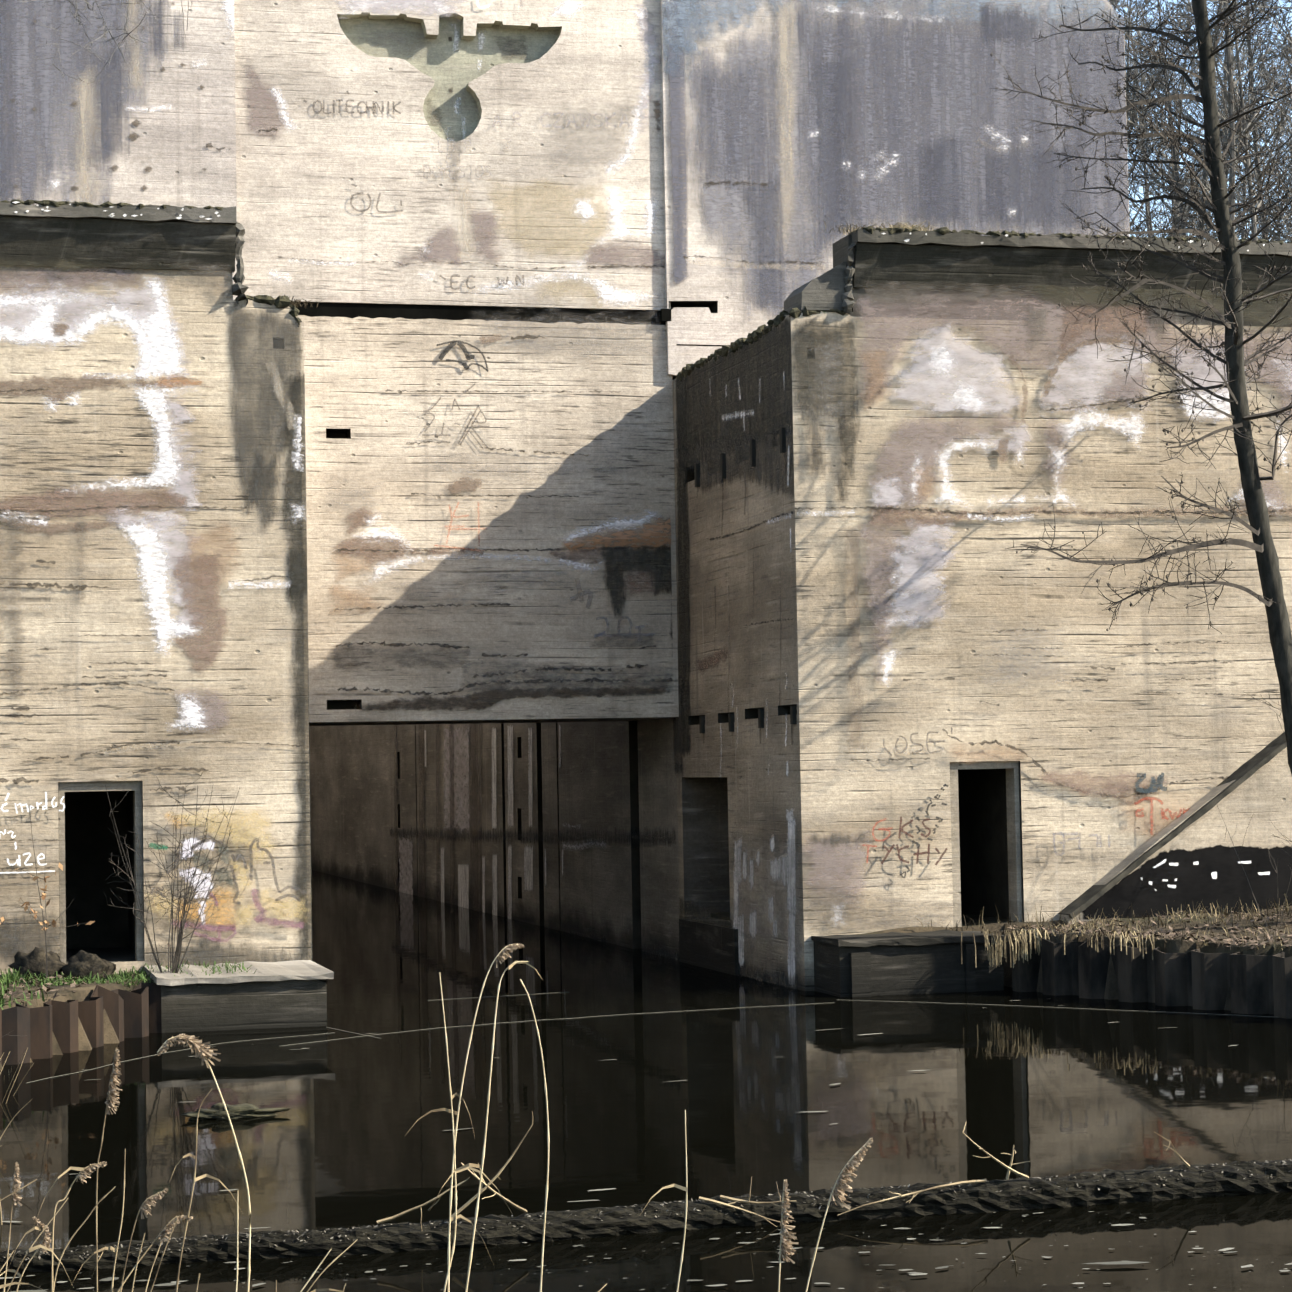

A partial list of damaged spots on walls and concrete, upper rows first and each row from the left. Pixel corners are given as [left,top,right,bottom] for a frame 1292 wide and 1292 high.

damp [0,0,179,201]
damp [339,0,464,47]
damp [427,178,497,263]
damp [0,260,226,670]
damp [448,477,481,493]
damp [535,0,1230,774]
damp [1242,291,1292,466]
damp [1261,480,1287,510]
damp [150,265,313,965]
damp [0,916,63,959]
damp [390,724,675,919]
damp [680,813,953,990]